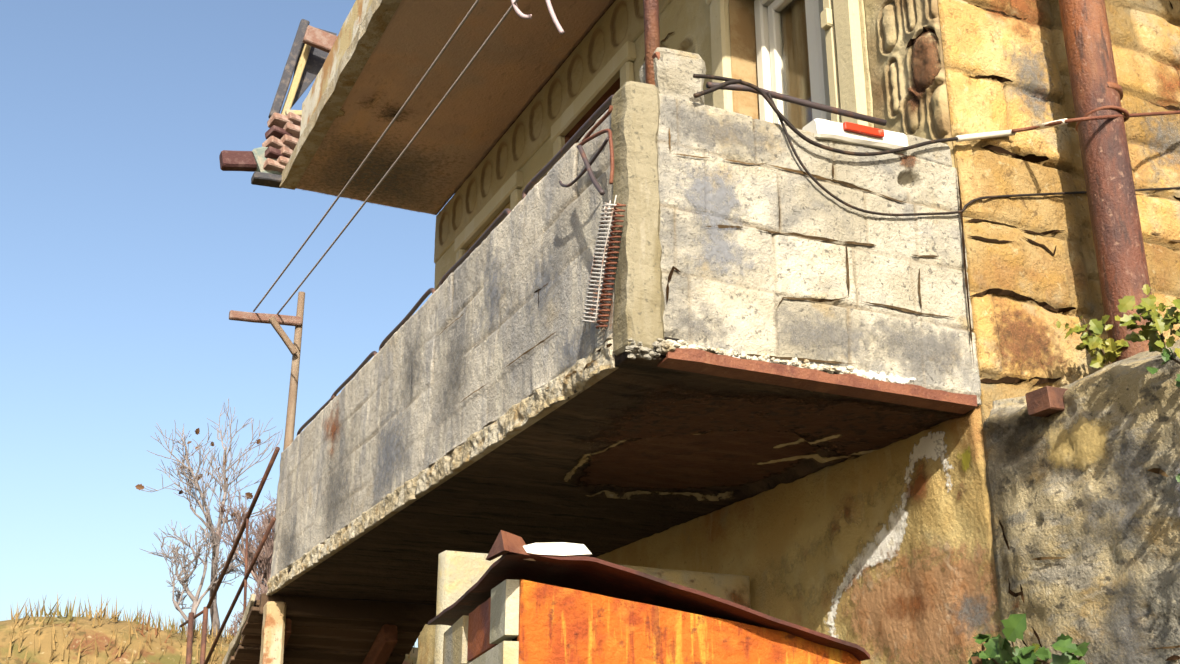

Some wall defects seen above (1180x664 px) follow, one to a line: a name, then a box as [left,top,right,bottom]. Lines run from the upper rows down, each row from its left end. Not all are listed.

spalling [559,106,614,196]
spalling [625,338,676,360]
peeling [770,360,915,384]
corrosion [584,387,965,459]
water stain [826,431,954,638]